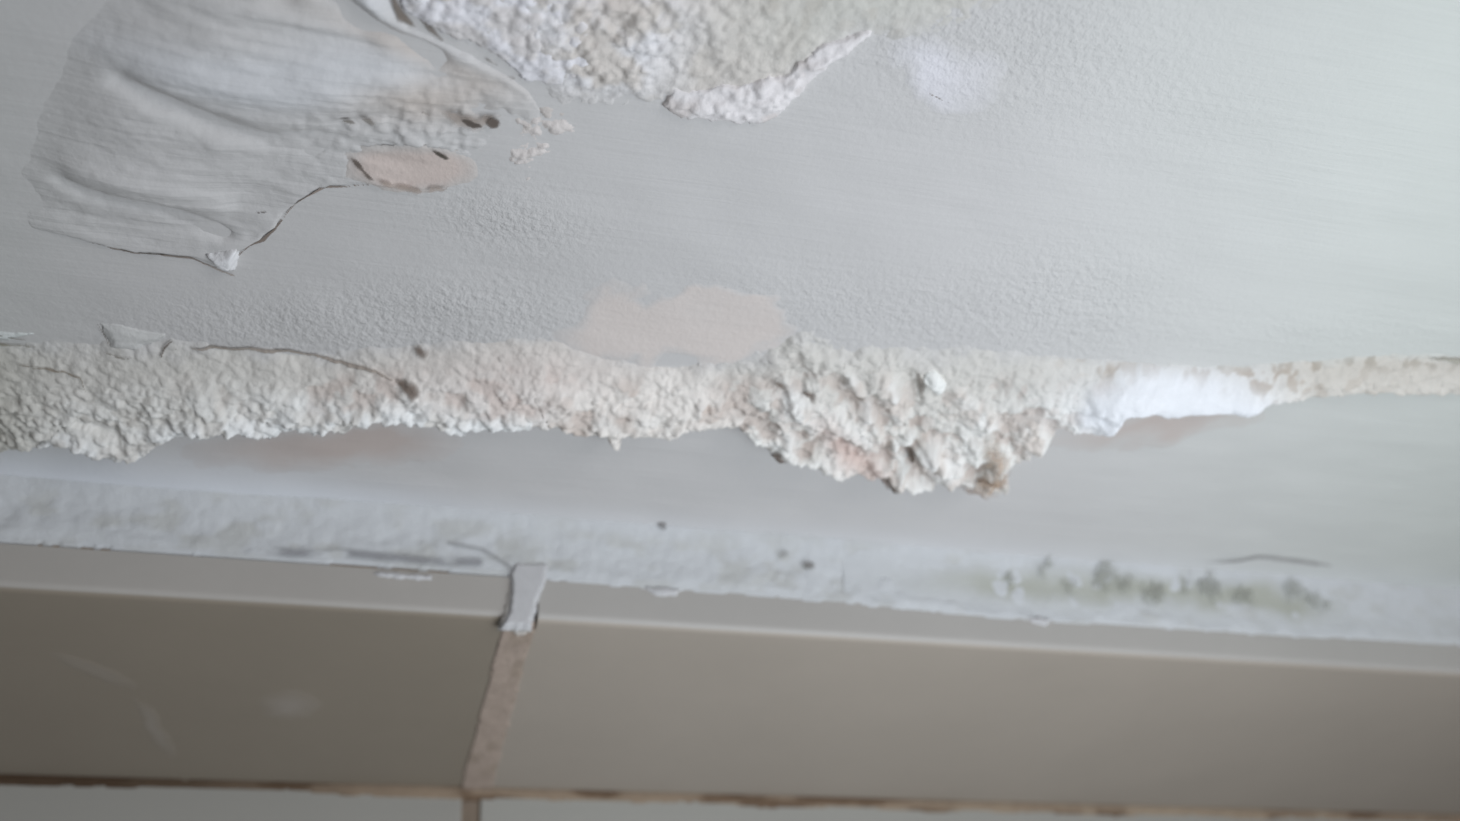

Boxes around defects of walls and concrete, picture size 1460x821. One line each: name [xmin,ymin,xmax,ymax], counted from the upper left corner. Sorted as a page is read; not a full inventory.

crack [89,185,364,276]
peeling [353,160,445,194]
spalling [400,0,1003,180]
spalling [0,323,1460,497]